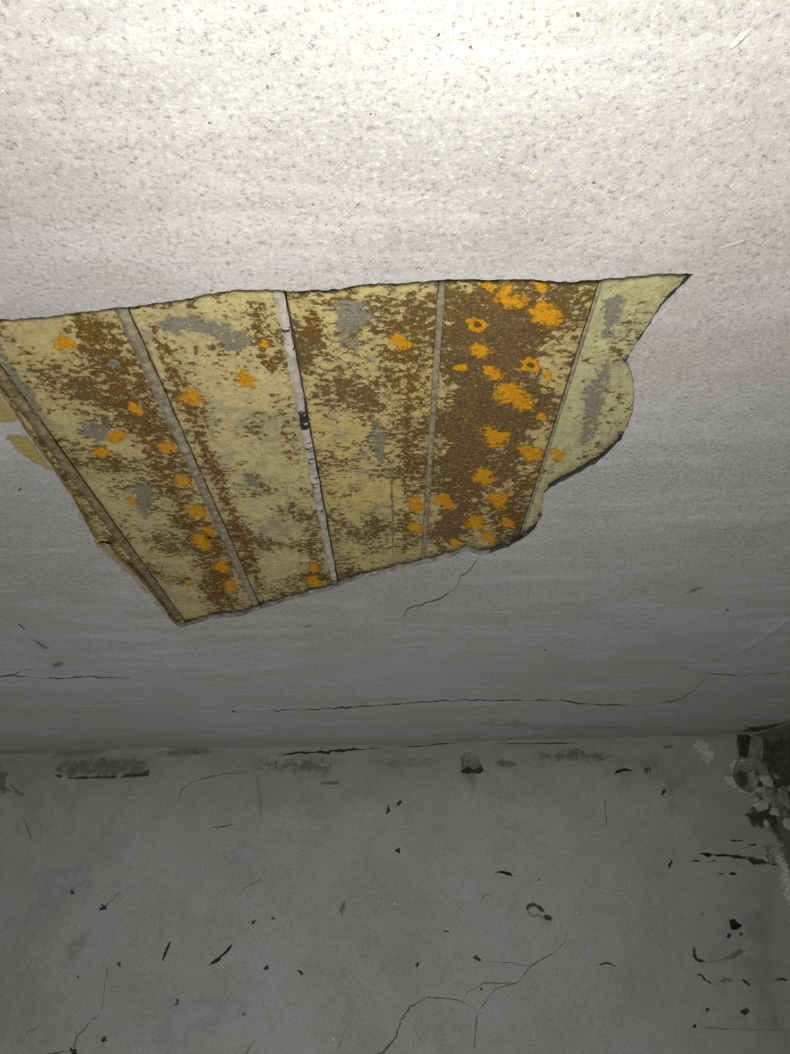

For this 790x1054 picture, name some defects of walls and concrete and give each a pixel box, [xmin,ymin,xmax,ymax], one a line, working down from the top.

spalling [622,274,693,361]
spalling [543,400,634,493]
spalling [0,387,542,628]